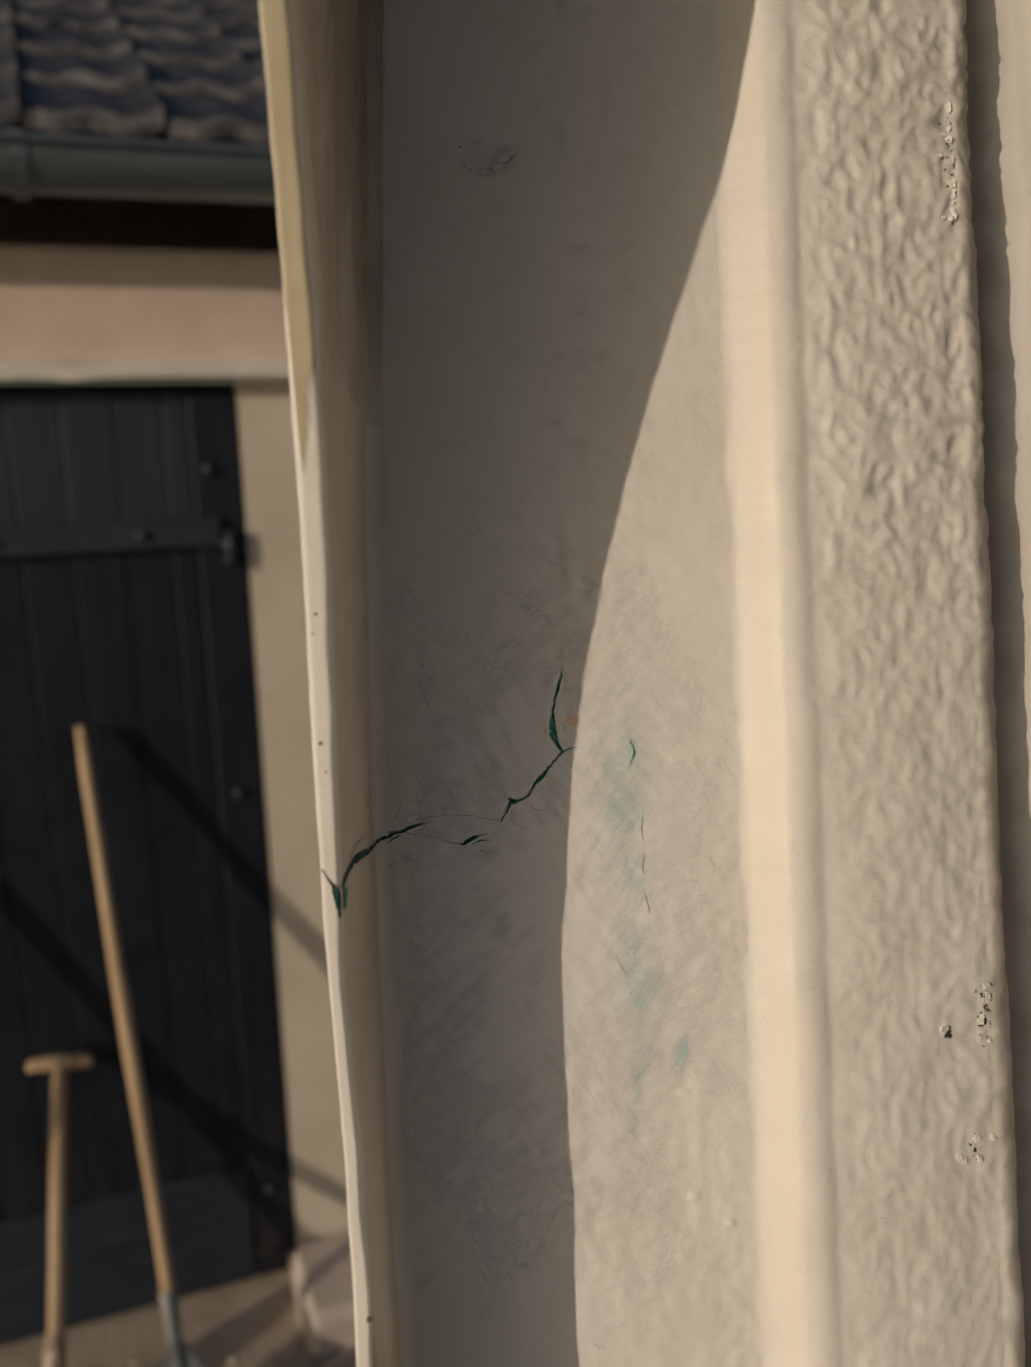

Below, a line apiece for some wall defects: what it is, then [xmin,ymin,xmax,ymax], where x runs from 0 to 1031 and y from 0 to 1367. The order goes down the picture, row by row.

crack [321,665,578,919]